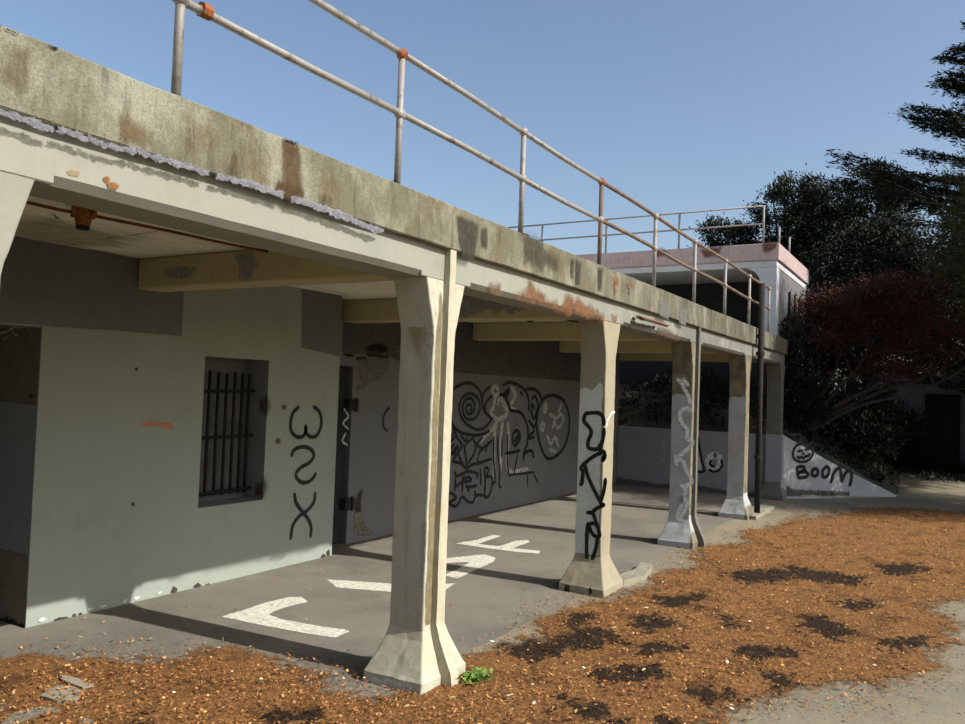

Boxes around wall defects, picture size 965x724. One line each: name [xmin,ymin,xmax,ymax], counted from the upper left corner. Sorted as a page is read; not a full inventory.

peeling [0,108,384,234]
water stain [457,216,487,259]
peeling [459,296,518,316]
corrosion [522,282,617,321]